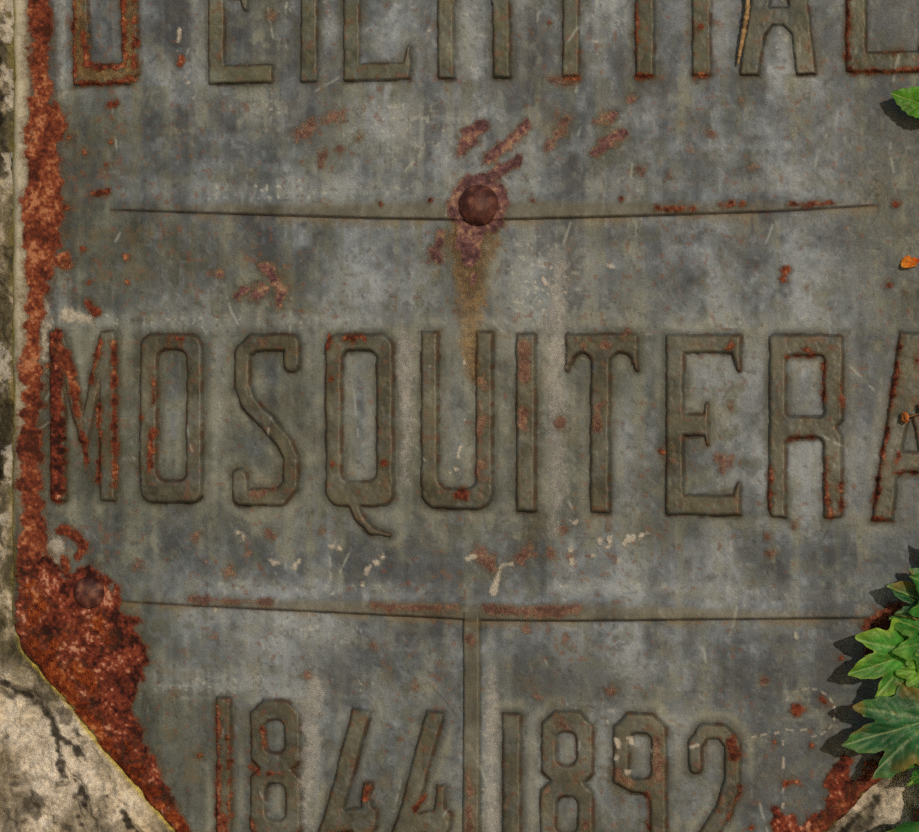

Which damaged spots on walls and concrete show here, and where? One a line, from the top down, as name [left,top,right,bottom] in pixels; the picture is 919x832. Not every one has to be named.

rust [843,0,919,76]
rust [427,118,531,287]
rust [232,261,288,309]
rust [779,265,791,283]
rust [889,344,904,409]
rust [13,0,191,832]
rust [871,425,918,522]
rust [482,603,582,633]
rust [861,601,911,631]
rust [791,703,805,717]
rust [214,705,234,832]
rust [770,751,885,832]